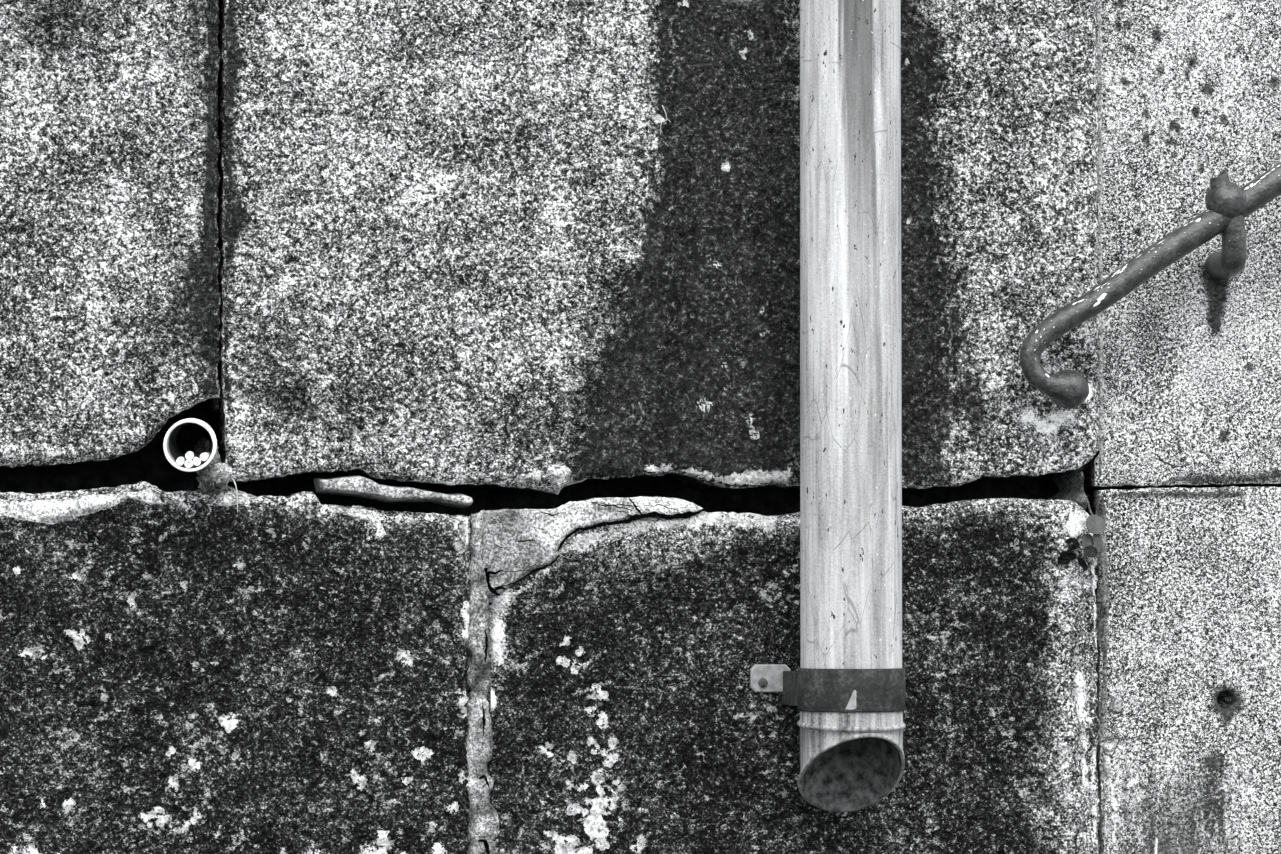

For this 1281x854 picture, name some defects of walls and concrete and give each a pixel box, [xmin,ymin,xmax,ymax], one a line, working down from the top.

damp [567,0,800,486]
crack [1078,450,1100,473]
damp [456,517,470,548]
damp [1058,509,1093,537]
crack [482,498,710,662]
damp [460,601,470,645]
damp [490,617,508,666]
damp [1072,551,1241,854]
damp [9,837,61,854]
damp [352,831,406,854]
damp [432,843,447,854]